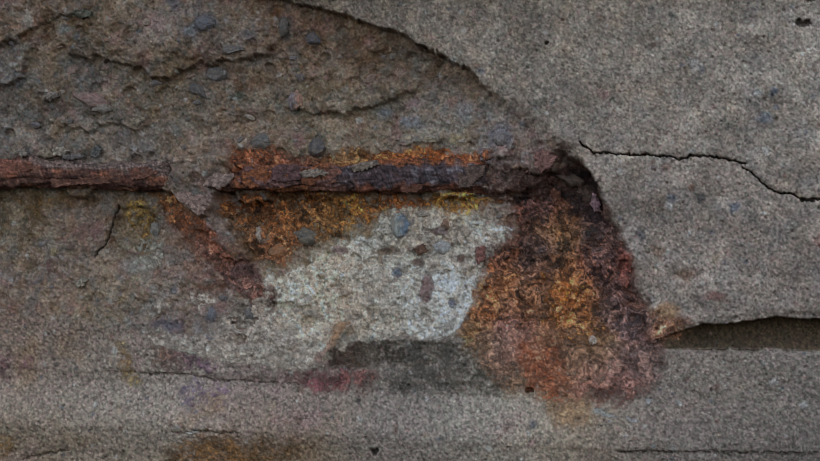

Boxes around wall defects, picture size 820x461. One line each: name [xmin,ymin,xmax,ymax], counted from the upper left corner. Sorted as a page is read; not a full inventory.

spalling [0,0,644,370]
rust [118,145,685,425]
crack [580,141,820,202]